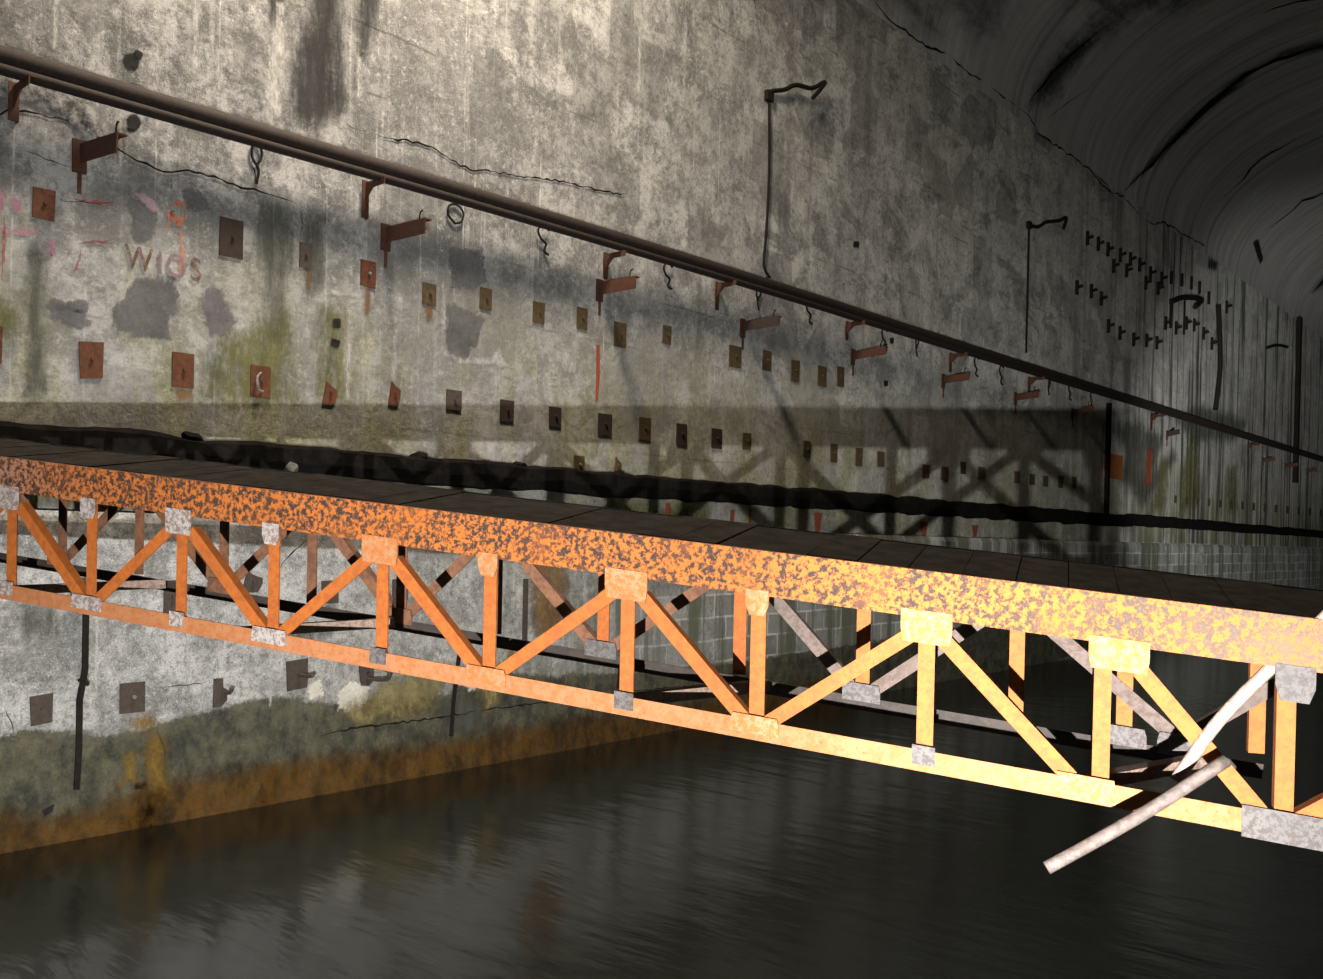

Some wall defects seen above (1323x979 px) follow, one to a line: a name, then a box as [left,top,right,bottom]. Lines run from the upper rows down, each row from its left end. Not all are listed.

water stain [266,0,378,125]
crack [0,109,303,238]
crack [347,124,629,207]
corrosion [532,565,566,633]
water stain [508,672,721,711]
corrosion [682,698,731,715]
corrosion [765,681,821,714]
water stain [712,637,918,704]
water stain [935,653,966,683]
water stain [952,627,1089,673]
water stain [0,674,686,852]
corrosion [0,713,687,854]